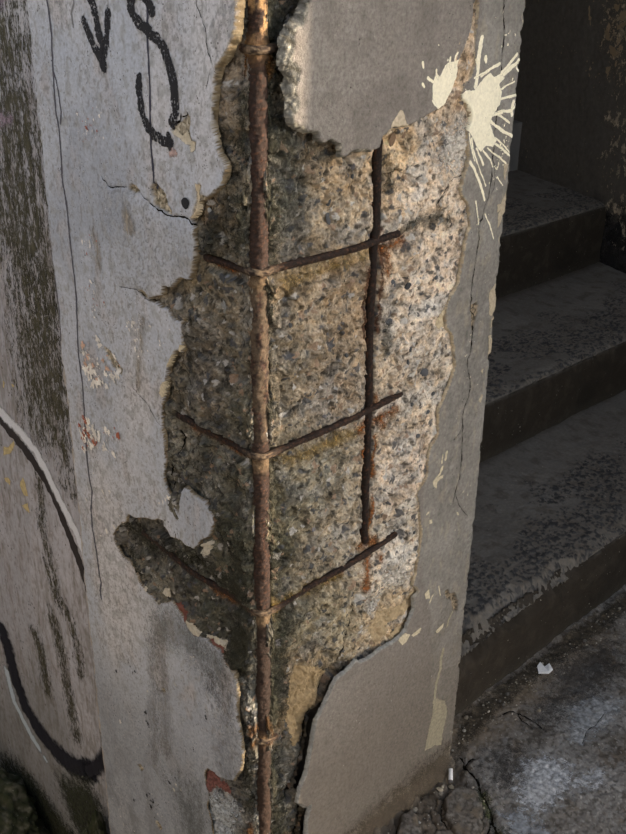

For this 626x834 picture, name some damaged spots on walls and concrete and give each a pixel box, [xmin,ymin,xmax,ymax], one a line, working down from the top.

peeling [588,0,626,251]
crack [102,178,197,225]
rust [361,236,406,339]
crack [452,107,498,513]
leakage [3,239,78,503]
peeling [78,415,120,458]
peeling [81,335,121,389]
spalling [100,0,510,834]
rust [355,493,383,594]
crack [459,757,498,834]